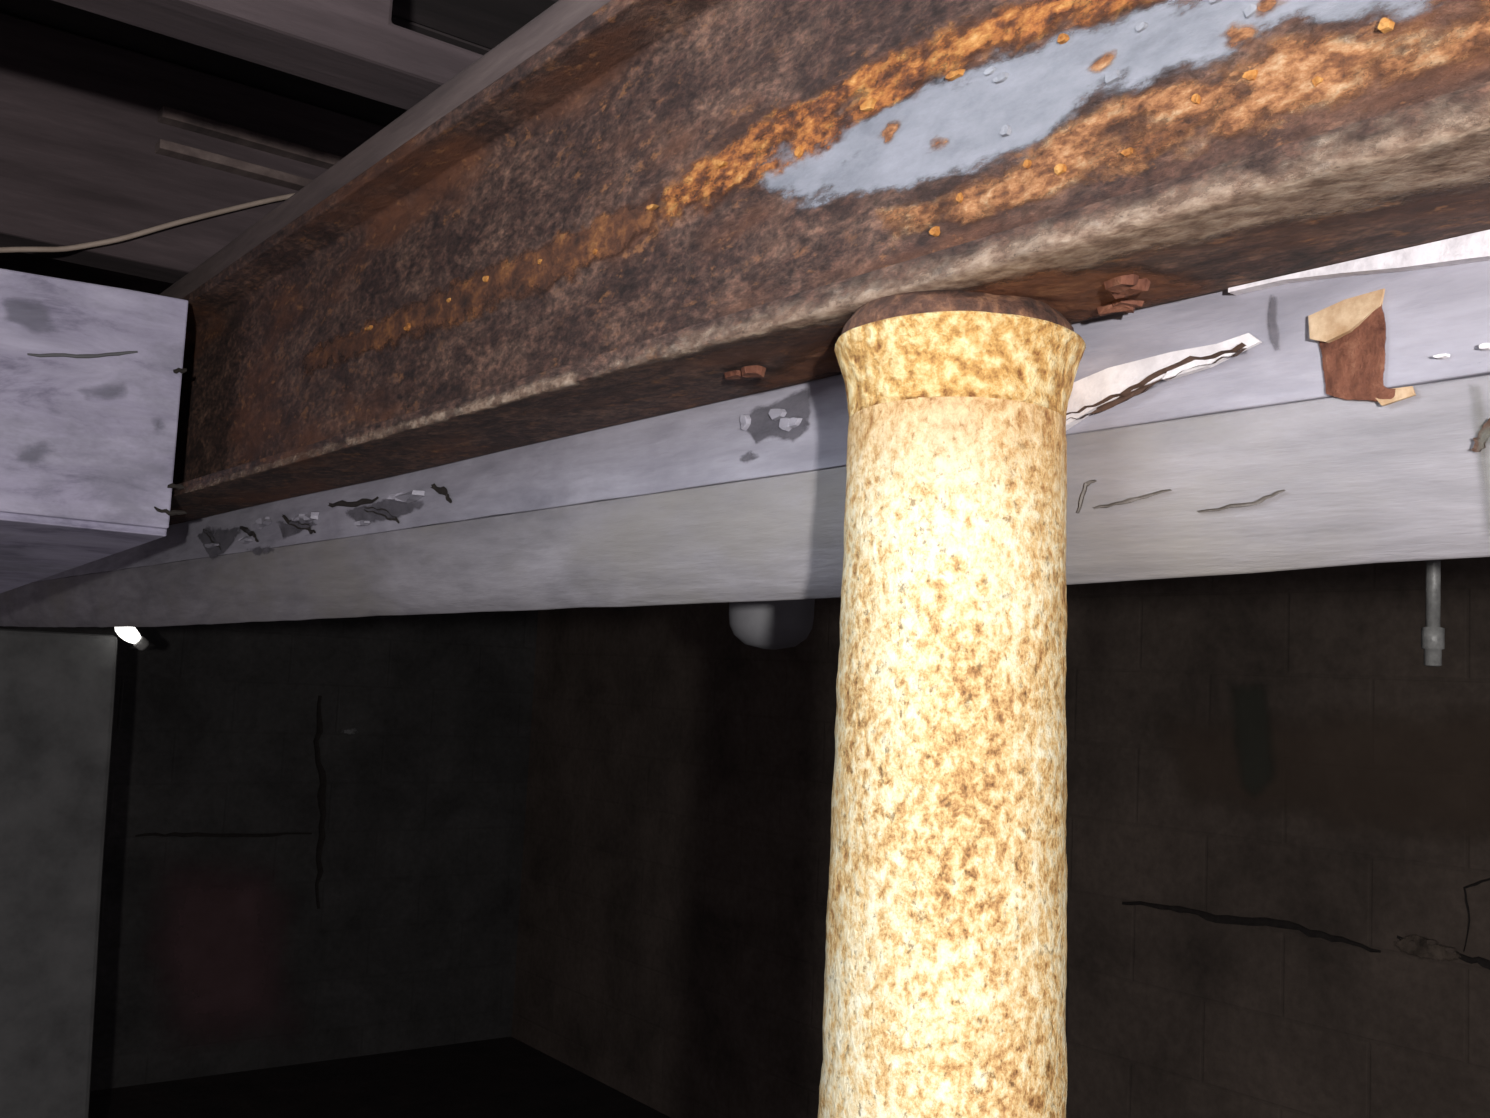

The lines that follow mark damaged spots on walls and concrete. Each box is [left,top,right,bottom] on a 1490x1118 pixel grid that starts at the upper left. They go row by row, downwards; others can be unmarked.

peeling [760,0,1440,207]
rust [879,0,1490,237]
rust [302,0,1141,375]
rust [670,114,1490,392]
rust [241,432,383,477]
rust [400,373,575,428]
peeling [740,390,810,461]
peeling [1066,297,1279,431]
peeling [1308,289,1416,406]
peeling [198,483,452,558]
crack [1122,901,1403,953]
crack [1439,878,1490,970]